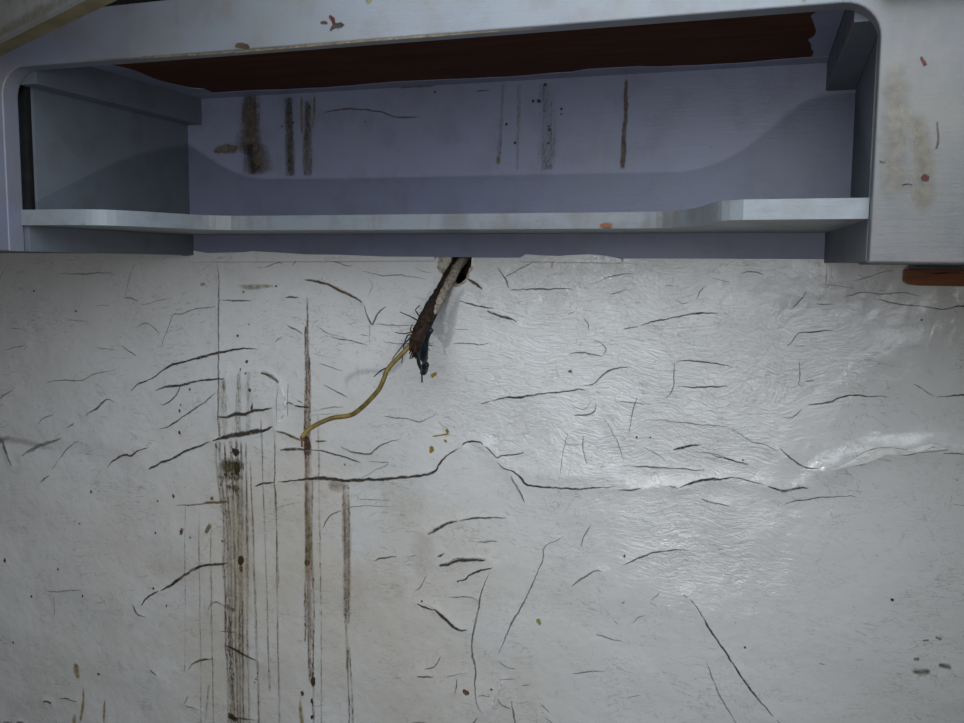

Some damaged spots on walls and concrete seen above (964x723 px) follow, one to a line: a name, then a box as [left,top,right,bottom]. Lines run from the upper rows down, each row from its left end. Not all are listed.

crack [793,270,964,310]
crack [1,261,855,506]
crack [785,330,885,418]
peeling [831,443,948,471]
crack [133,563,227,617]
crack [191,631,256,665]
leakage [215,415,277,723]
leakage [299,306,322,723]
crack [417,517,590,723]
crack [626,549,686,564]
crack [683,595,779,722]